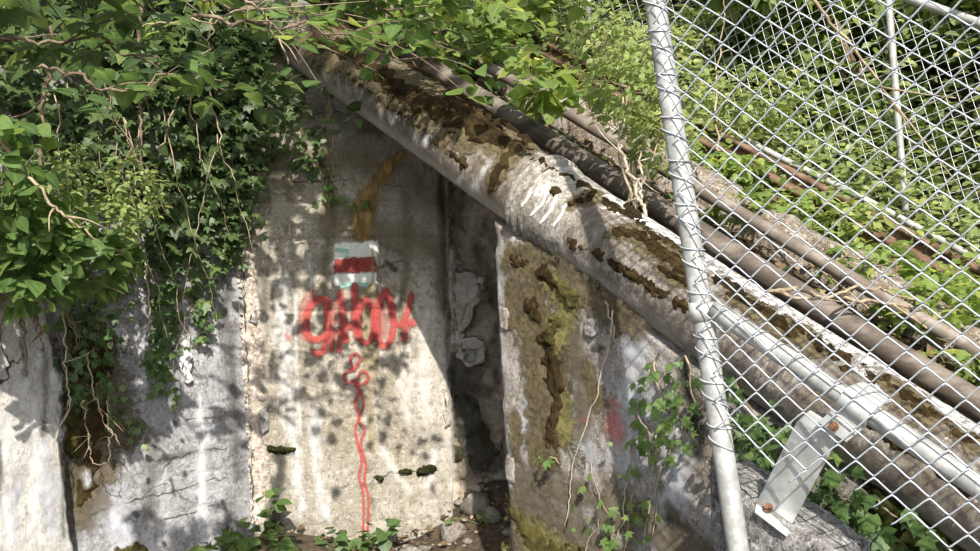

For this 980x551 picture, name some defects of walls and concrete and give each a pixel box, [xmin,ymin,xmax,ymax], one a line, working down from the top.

rust [353,150,403,242]
leakage [521,188,567,227]
crack [0,317,48,384]
spalling [444,272,486,367]
spalling [498,304,509,331]
peeling [427,452,437,488]
spalling [444,384,453,489]
spalling [505,454,516,483]
leakage [624,338,644,471]
leakage [655,419,683,521]